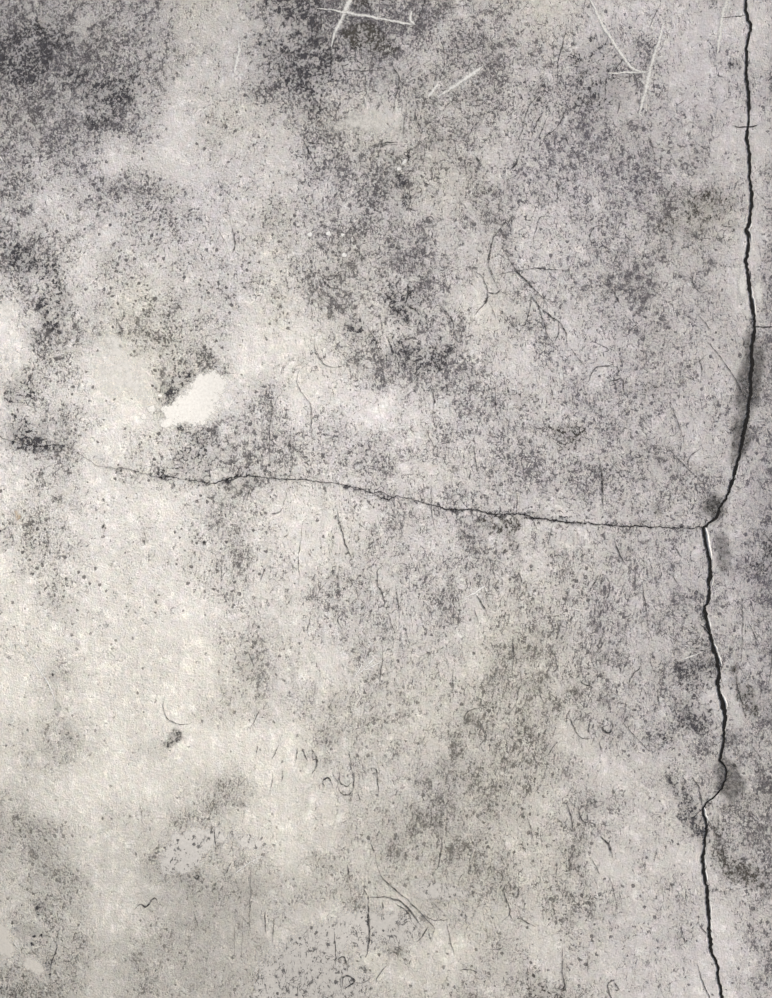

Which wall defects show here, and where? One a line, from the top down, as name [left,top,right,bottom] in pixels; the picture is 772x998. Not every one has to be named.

crack [80,454,178,480]
crack [189,0,772,998]